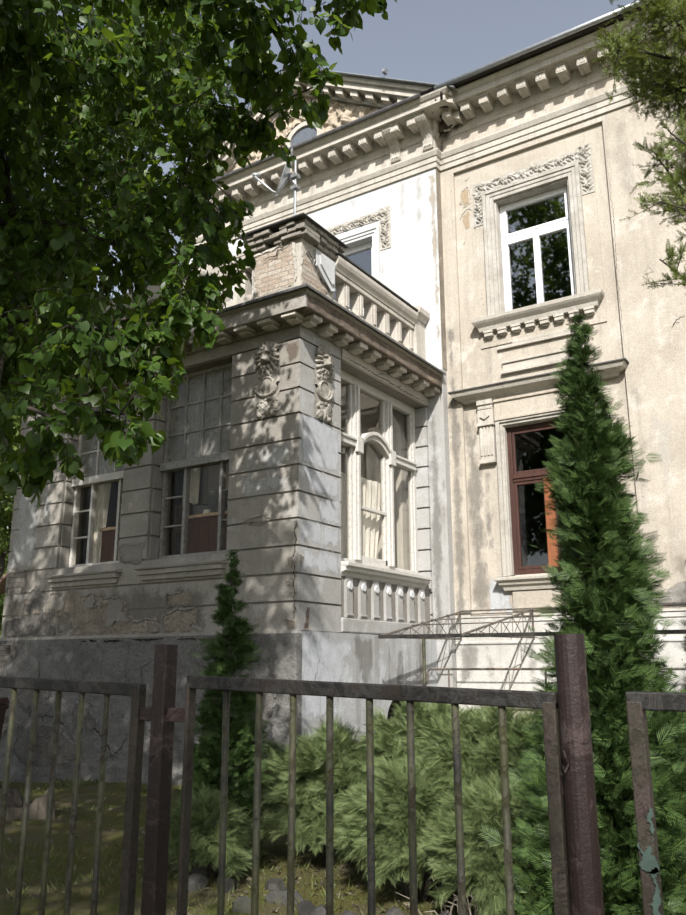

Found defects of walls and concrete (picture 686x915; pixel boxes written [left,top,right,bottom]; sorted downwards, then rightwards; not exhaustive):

spalling [251,240,442,389]
crack [287,526,297,624]
spalling [0,587,57,676]
spalling [139,660,154,700]